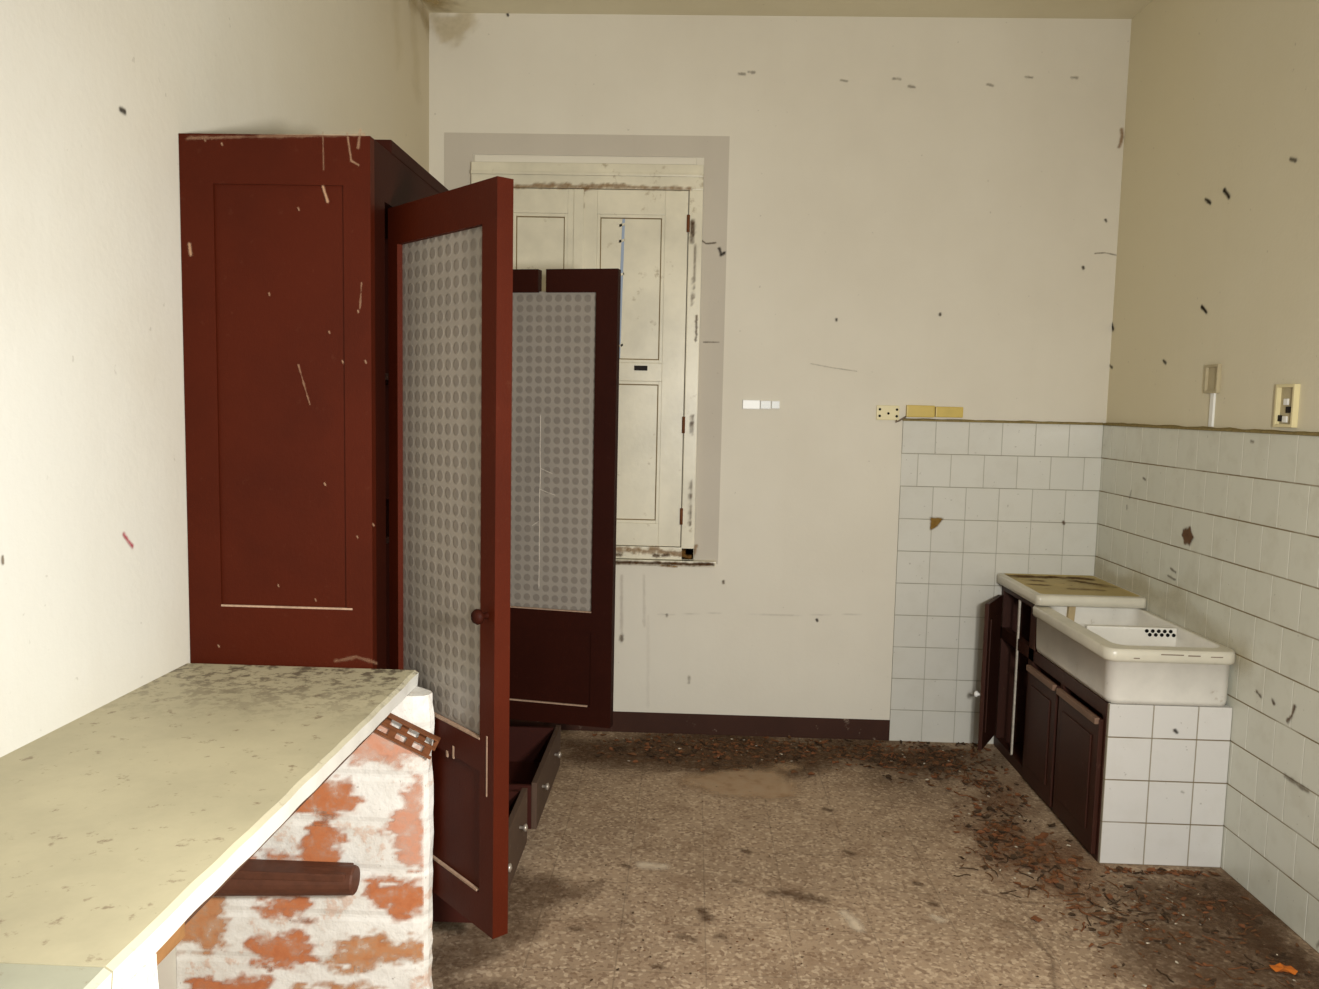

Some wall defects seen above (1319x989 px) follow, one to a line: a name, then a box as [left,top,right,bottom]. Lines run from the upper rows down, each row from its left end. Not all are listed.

peeling [250,782,364,862]
peeling [351,723,424,920]
peeling [182,896,424,989]